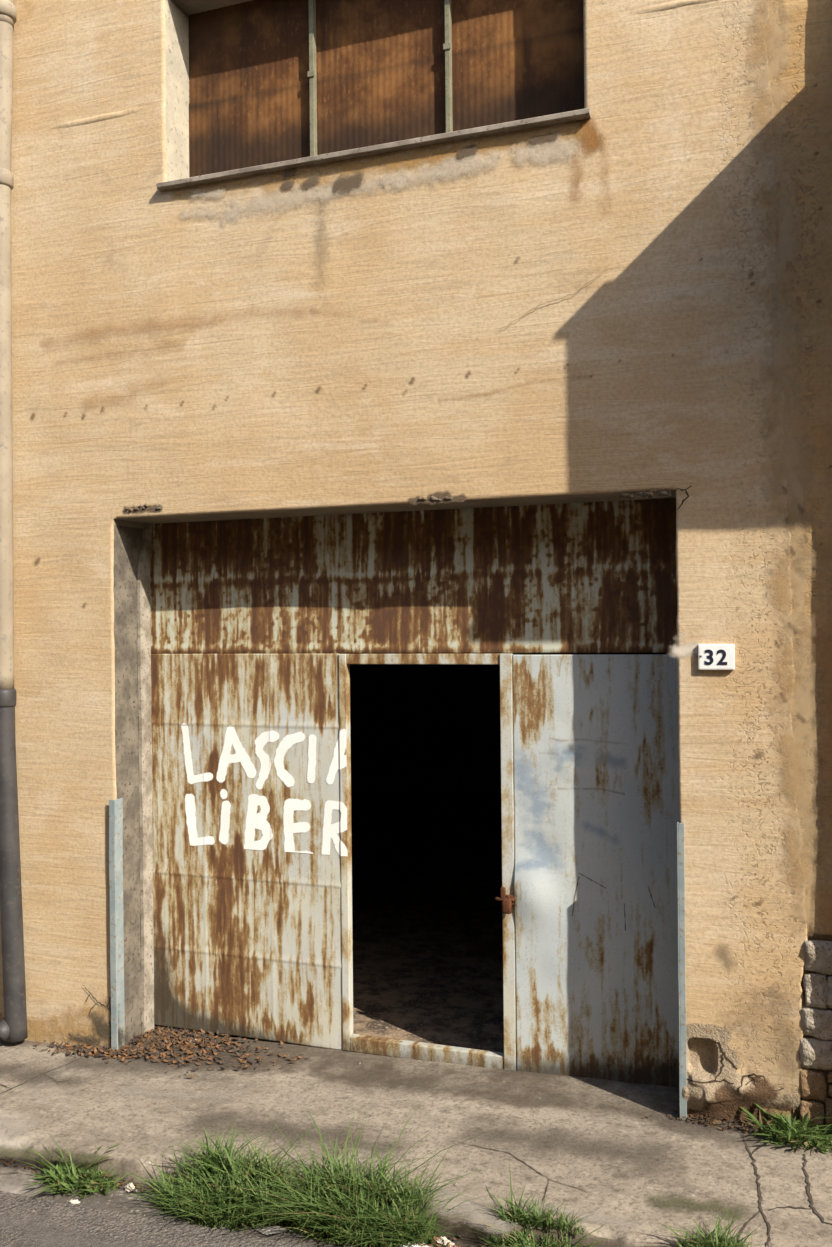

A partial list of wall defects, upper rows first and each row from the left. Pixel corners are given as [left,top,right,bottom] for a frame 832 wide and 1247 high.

peeling [184,132,576,224]
spalling [683,1023,801,1127]